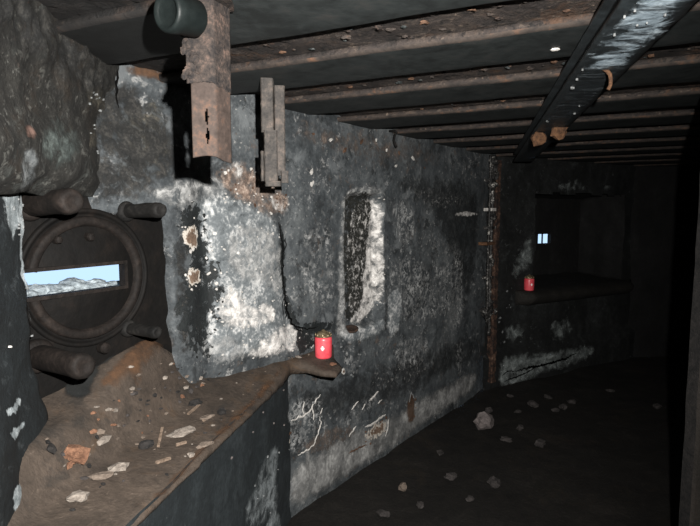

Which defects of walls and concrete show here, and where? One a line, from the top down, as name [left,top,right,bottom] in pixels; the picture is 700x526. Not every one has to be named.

corrosion [180,35,203,80]
peeling [177,166,296,360]
crack [279,225,318,332]
crack [502,353,577,382]
damp [293,375,476,501]